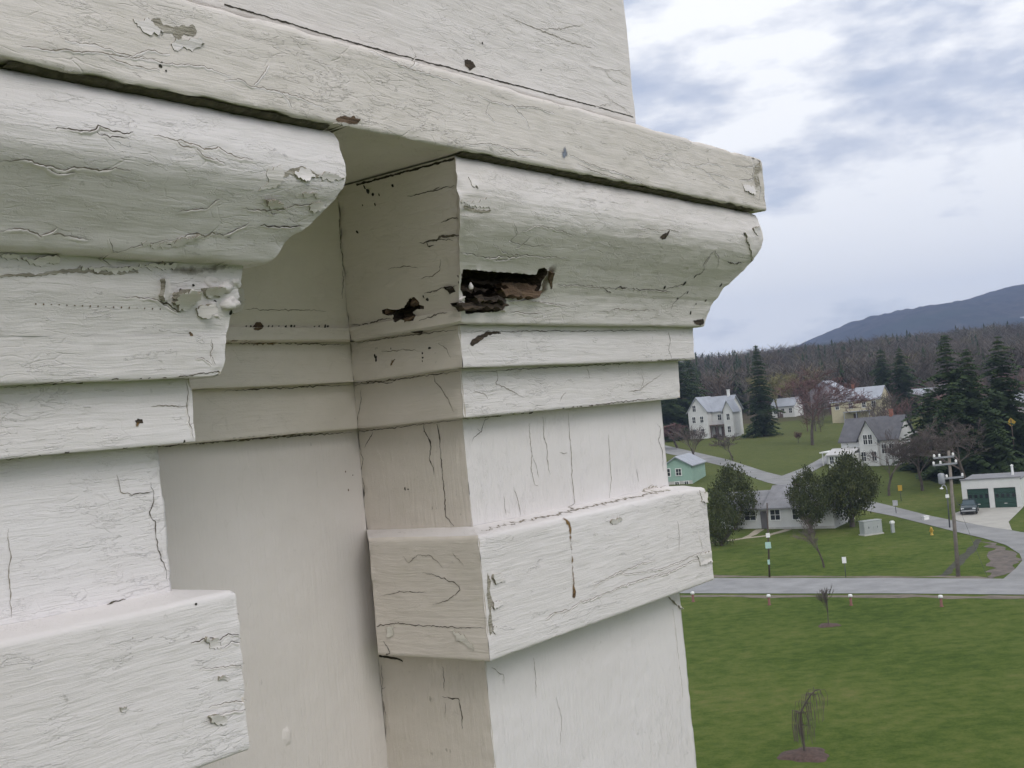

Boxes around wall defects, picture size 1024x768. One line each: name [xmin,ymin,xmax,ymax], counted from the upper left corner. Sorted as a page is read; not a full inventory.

peeling [133,17,205,52]
crack [56,125,253,166]
peeling [258,165,342,213]
peeling [0,234,246,321]
crack [0,199,310,267]
crack [390,217,743,321]
spalling [470,331,501,346]
crack [423,336,672,526]
crack [117,476,167,578]
crack [6,530,14,615]
crack [545,523,708,621]
crack [377,554,481,714]